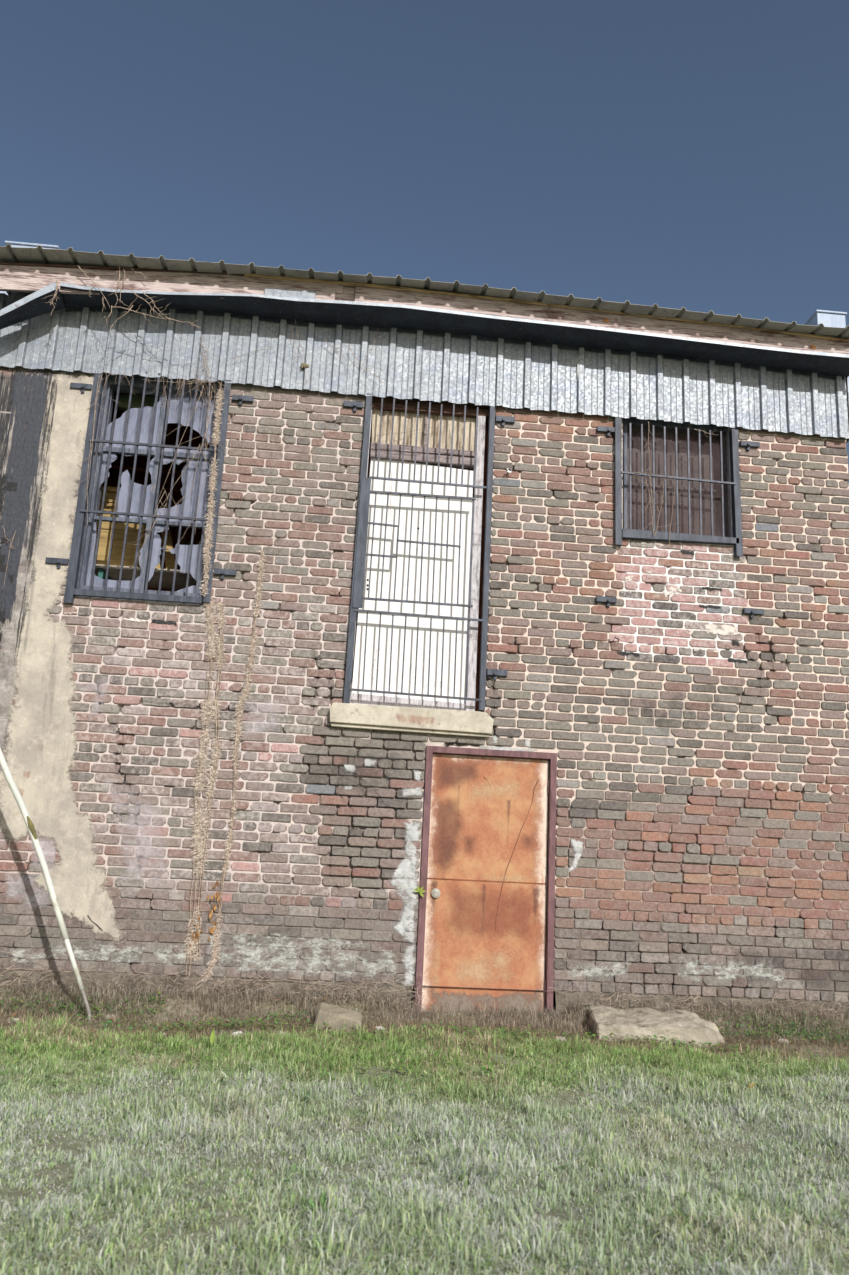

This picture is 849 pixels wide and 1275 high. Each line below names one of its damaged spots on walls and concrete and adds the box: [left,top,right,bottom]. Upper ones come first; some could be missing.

flaking render [0,371,120,943]
corrosion [426,754,544,1012]
leakage [210,933,396,976]
leakage [568,963,626,978]
leakage [679,961,784,981]